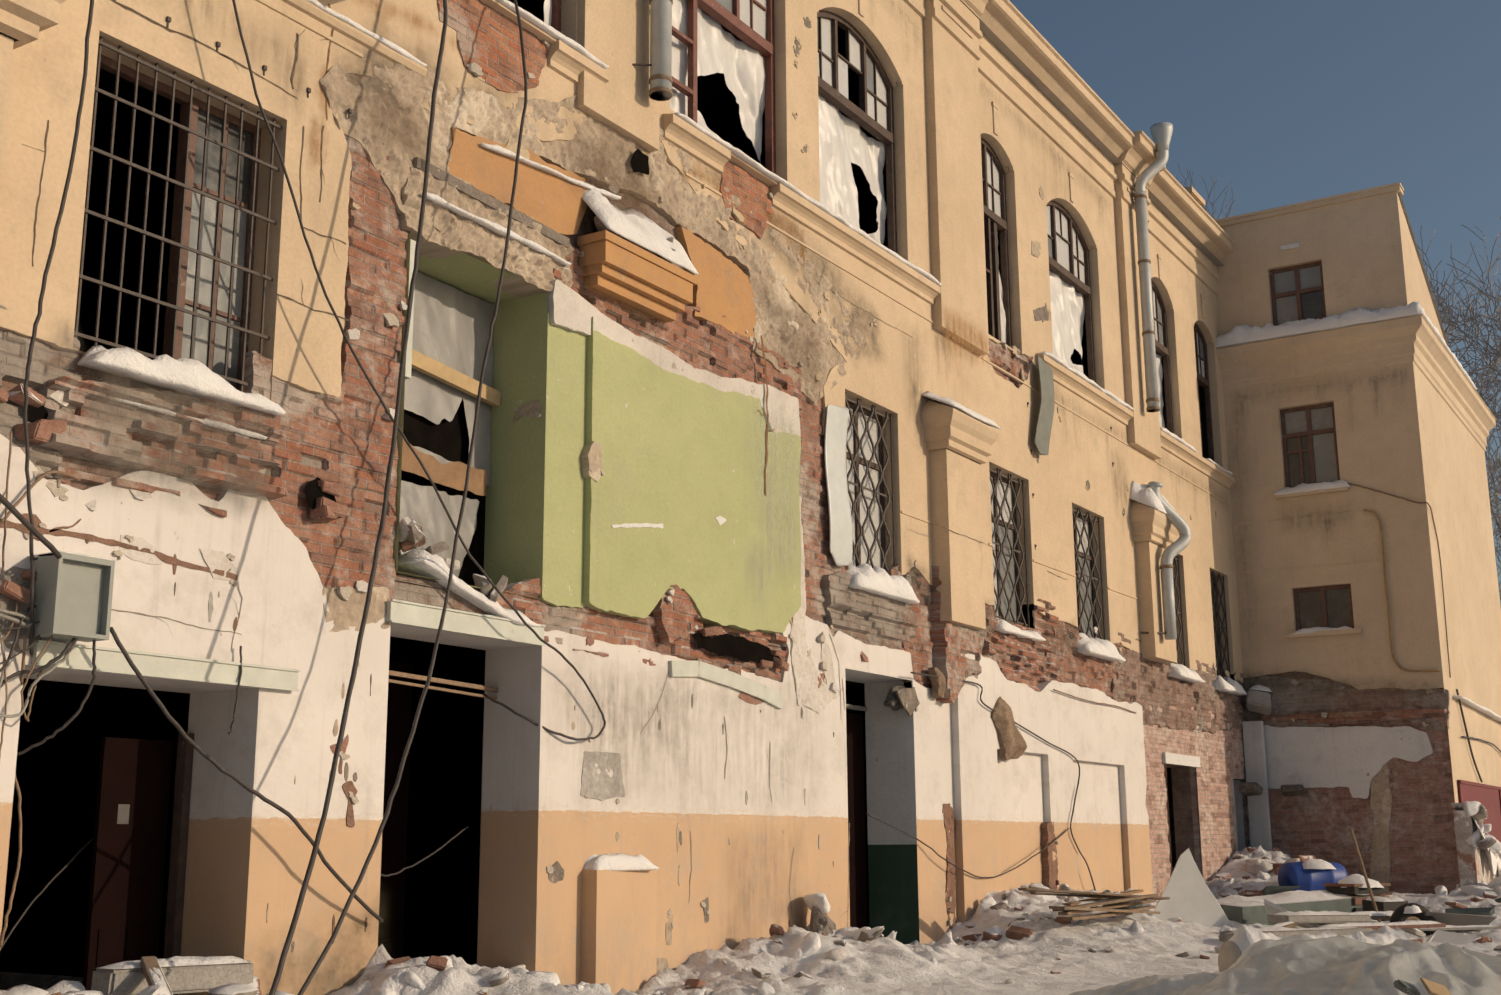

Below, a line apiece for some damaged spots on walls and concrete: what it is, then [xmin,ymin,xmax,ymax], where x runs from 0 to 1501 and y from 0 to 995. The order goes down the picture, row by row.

flaking render [437,0,551,93]
peeling [506,135,530,160]
spalling [631,149,649,175]
flaking render [701,161,774,250]
flaking render [0,116,408,632]
flaking render [0,566,42,657]
flaking render [497,246,1460,897]
flaking render [330,719,359,827]